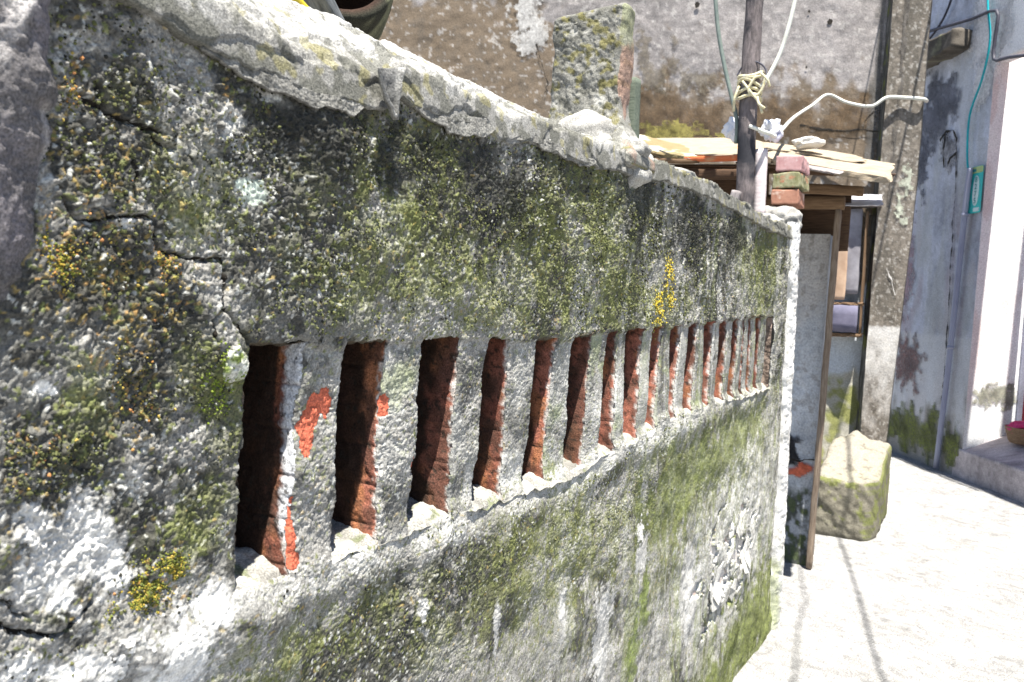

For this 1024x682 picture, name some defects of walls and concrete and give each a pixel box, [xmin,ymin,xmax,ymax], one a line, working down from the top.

crack [81,81,166,149]
water stain [636,29,716,95]
water stain [918,68,961,204]
crack [58,162,247,344]